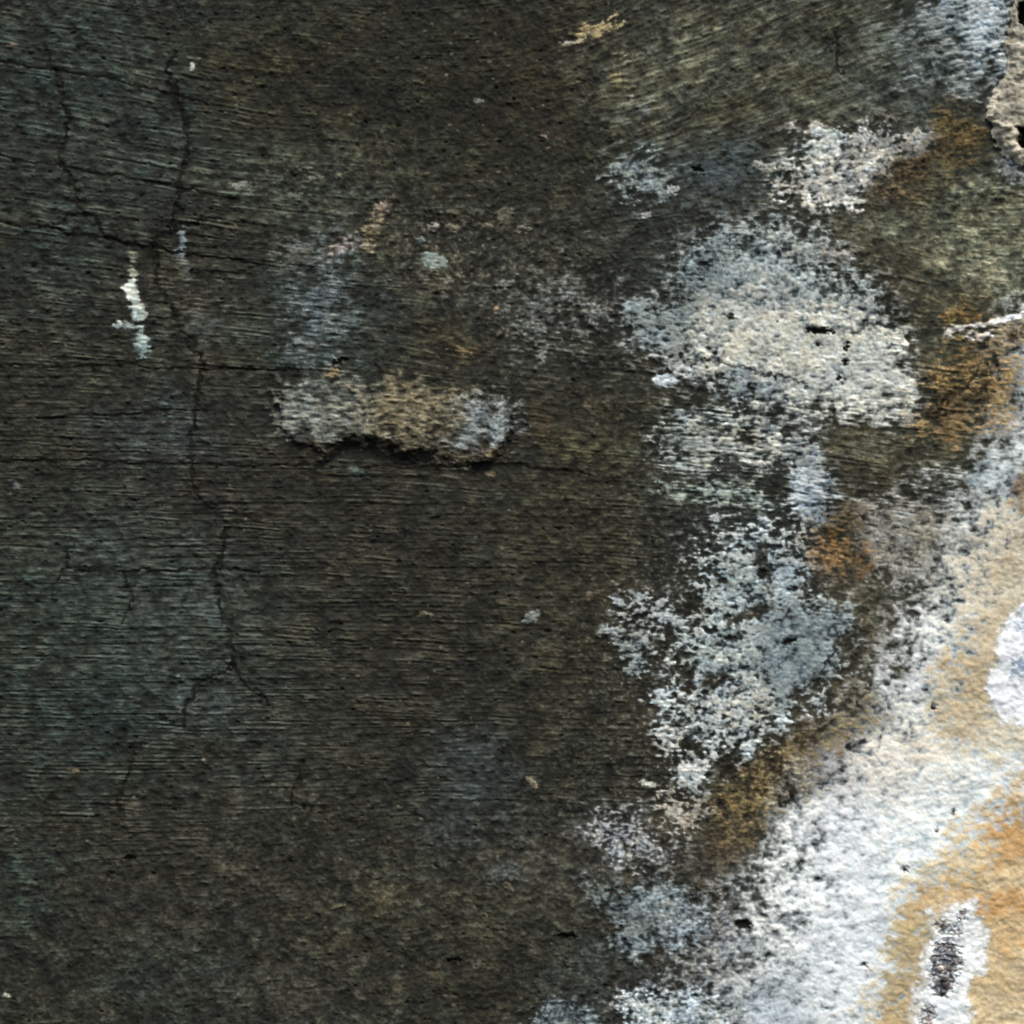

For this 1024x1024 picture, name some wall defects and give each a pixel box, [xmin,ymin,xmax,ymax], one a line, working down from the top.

crack [47,63,104,235]
flaking render [986,0,1024,165]
crack [132,51,206,497]
damp [505,275,606,357]
crack [59,544,92,579]
crack [160,520,269,727]
damp [598,120,1024,844]
damp [860,772,1024,1024]